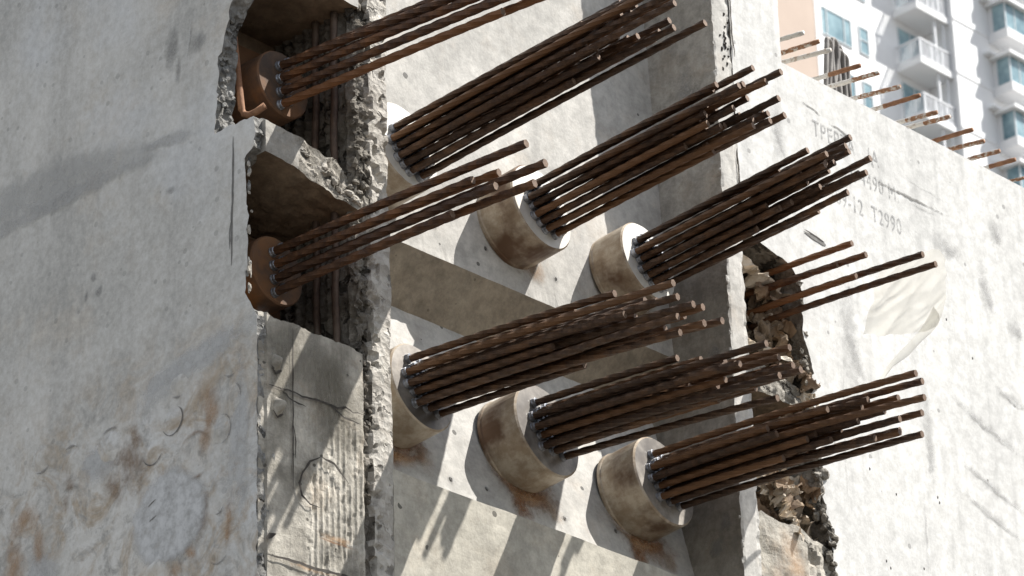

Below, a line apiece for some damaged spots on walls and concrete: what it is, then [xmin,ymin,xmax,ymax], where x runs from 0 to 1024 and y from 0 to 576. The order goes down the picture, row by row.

spalling [219,12,267,130]
spalling [301,21,373,207]
crack [227,144,235,264]
crack [269,328,363,508]
spalling [351,247,373,458]
spalling [798,319,815,410]
spalling [809,457,839,576]